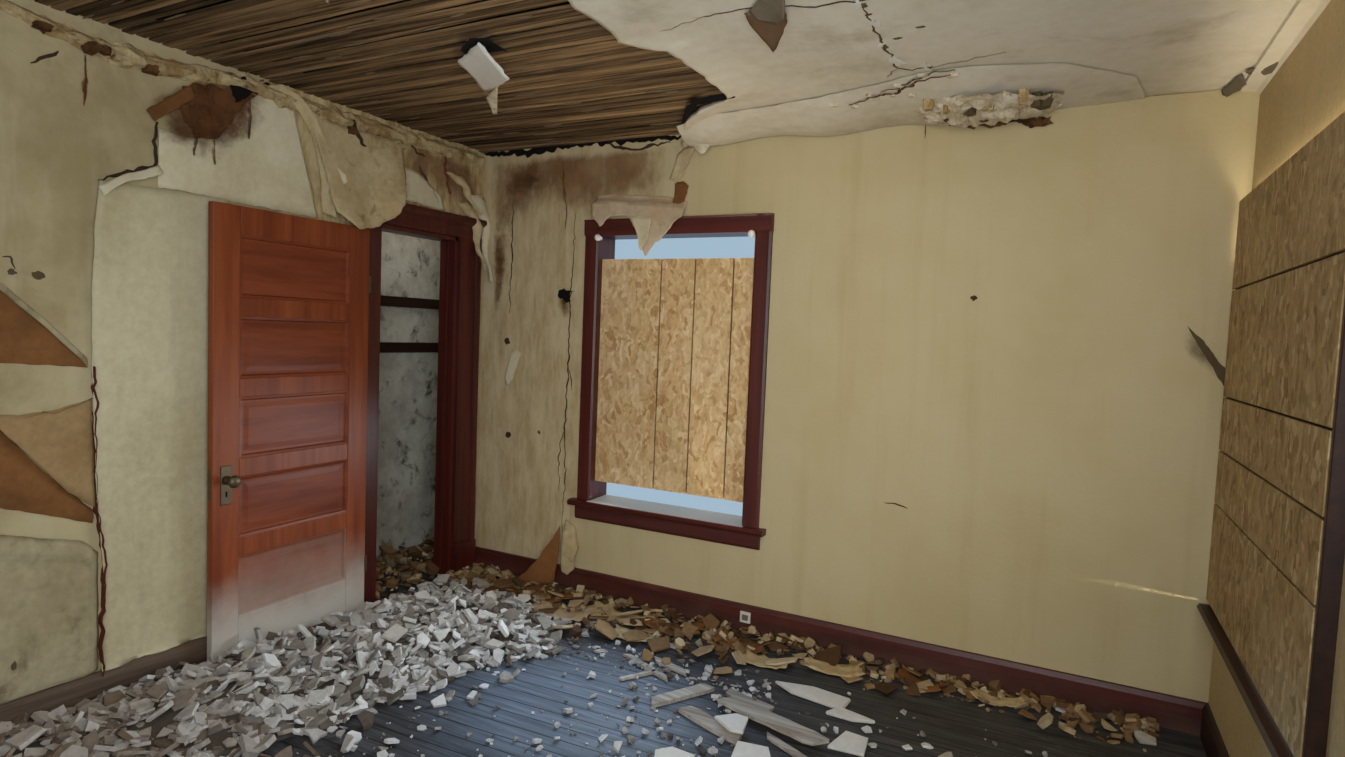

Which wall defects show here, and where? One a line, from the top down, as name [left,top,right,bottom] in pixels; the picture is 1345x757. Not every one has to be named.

crack [659,7,752,32]
spalling [744,0,787,52]
spalling [0,0,722,204]
crack [785,0,1006,109]
spalling [915,88,1065,129]
peeling [1221,62,1279,97]
peeling [405,167,446,211]
water stain [503,154,651,226]
spalling [7,268,45,280]
water stain [496,242,504,298]